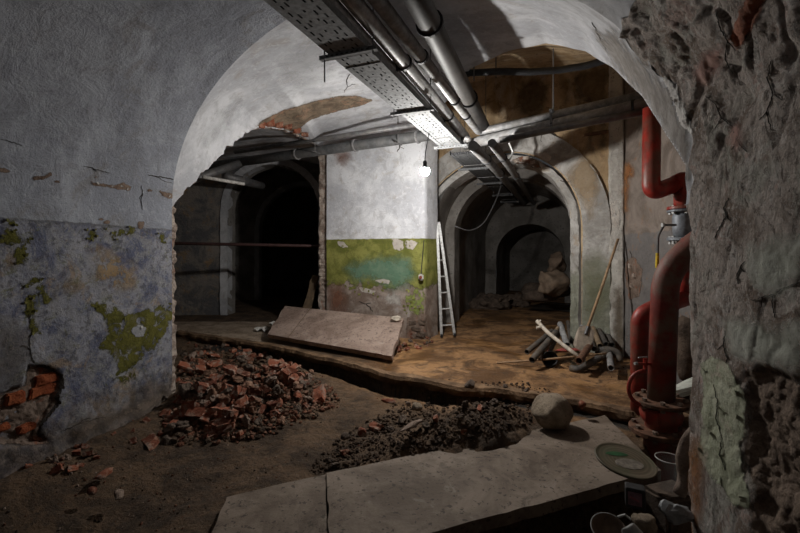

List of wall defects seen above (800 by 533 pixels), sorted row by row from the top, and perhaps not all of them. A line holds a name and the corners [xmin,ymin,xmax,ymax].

crack [715,10,736,74]
crack [759,60,782,130]
flaking render [91,176,131,191]
crack [139,175,173,205]
corrosion [624,163,634,210]
peeling [391,239,417,251]
flaking render [0,365,65,446]
spalling [698,321,800,533]